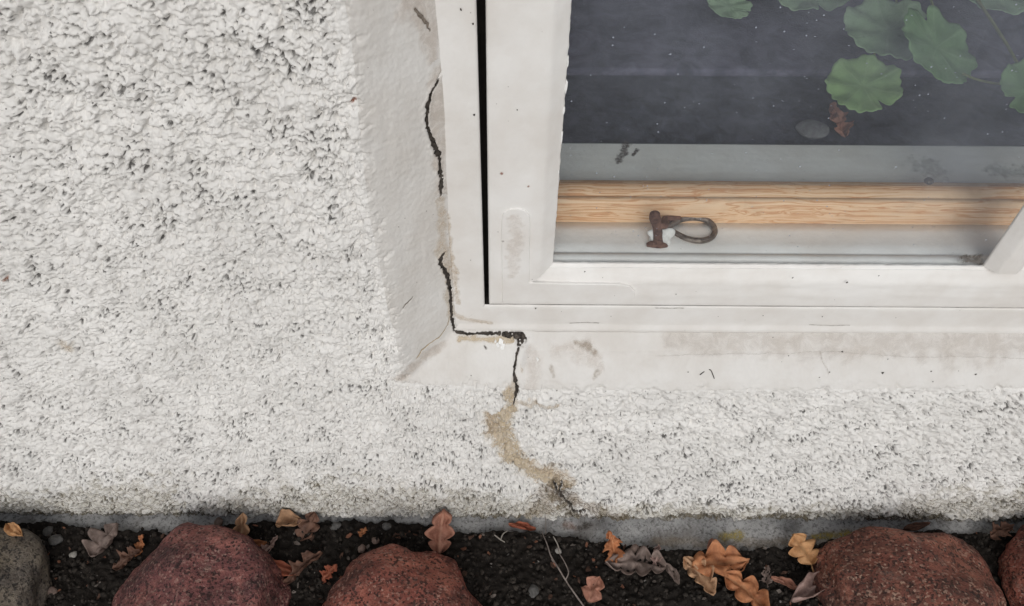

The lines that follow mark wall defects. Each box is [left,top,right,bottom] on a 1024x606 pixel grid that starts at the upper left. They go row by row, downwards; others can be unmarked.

crack [414,8,444,196]
crack [416,251,523,405]
crack [552,480,597,516]